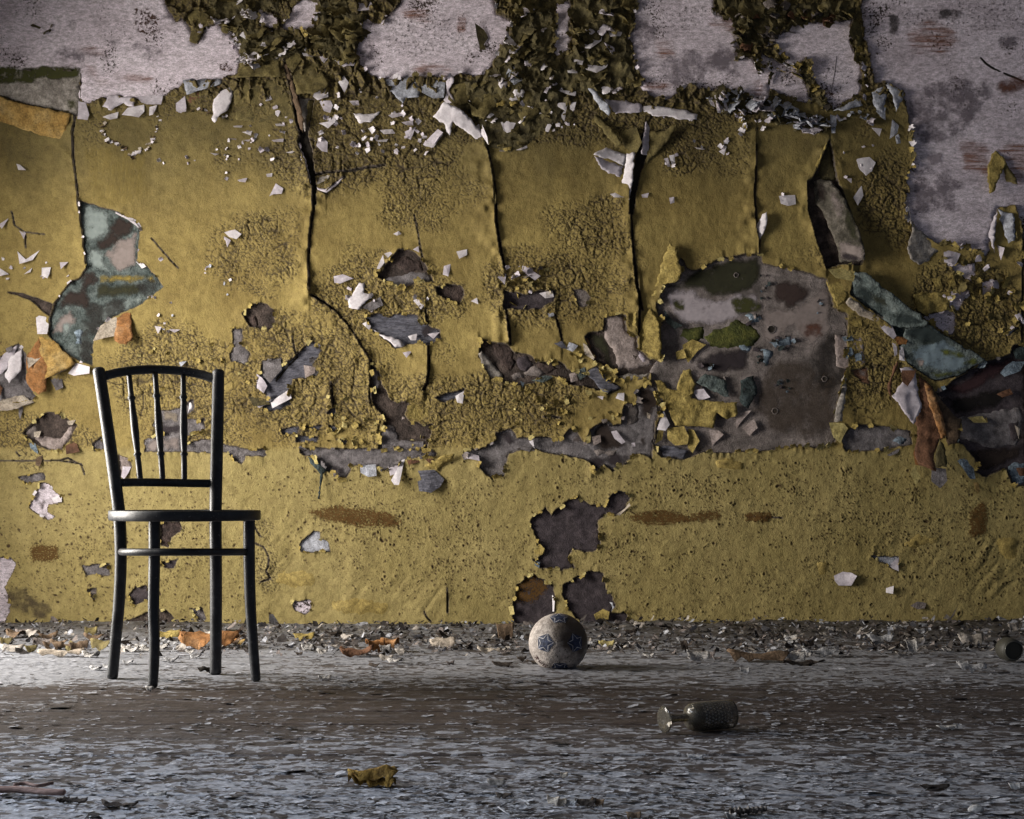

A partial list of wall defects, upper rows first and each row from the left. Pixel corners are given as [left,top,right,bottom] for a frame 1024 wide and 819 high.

crack [71,116,79,197]
crack [233,54,385,263]
crack [424,102,506,269]
peeling [0,0,1024,520]
crack [588,88,677,360]
crack [753,145,761,248]
crack [276,340,299,382]
crack [311,295,372,402]
peeling [508,491,632,623]